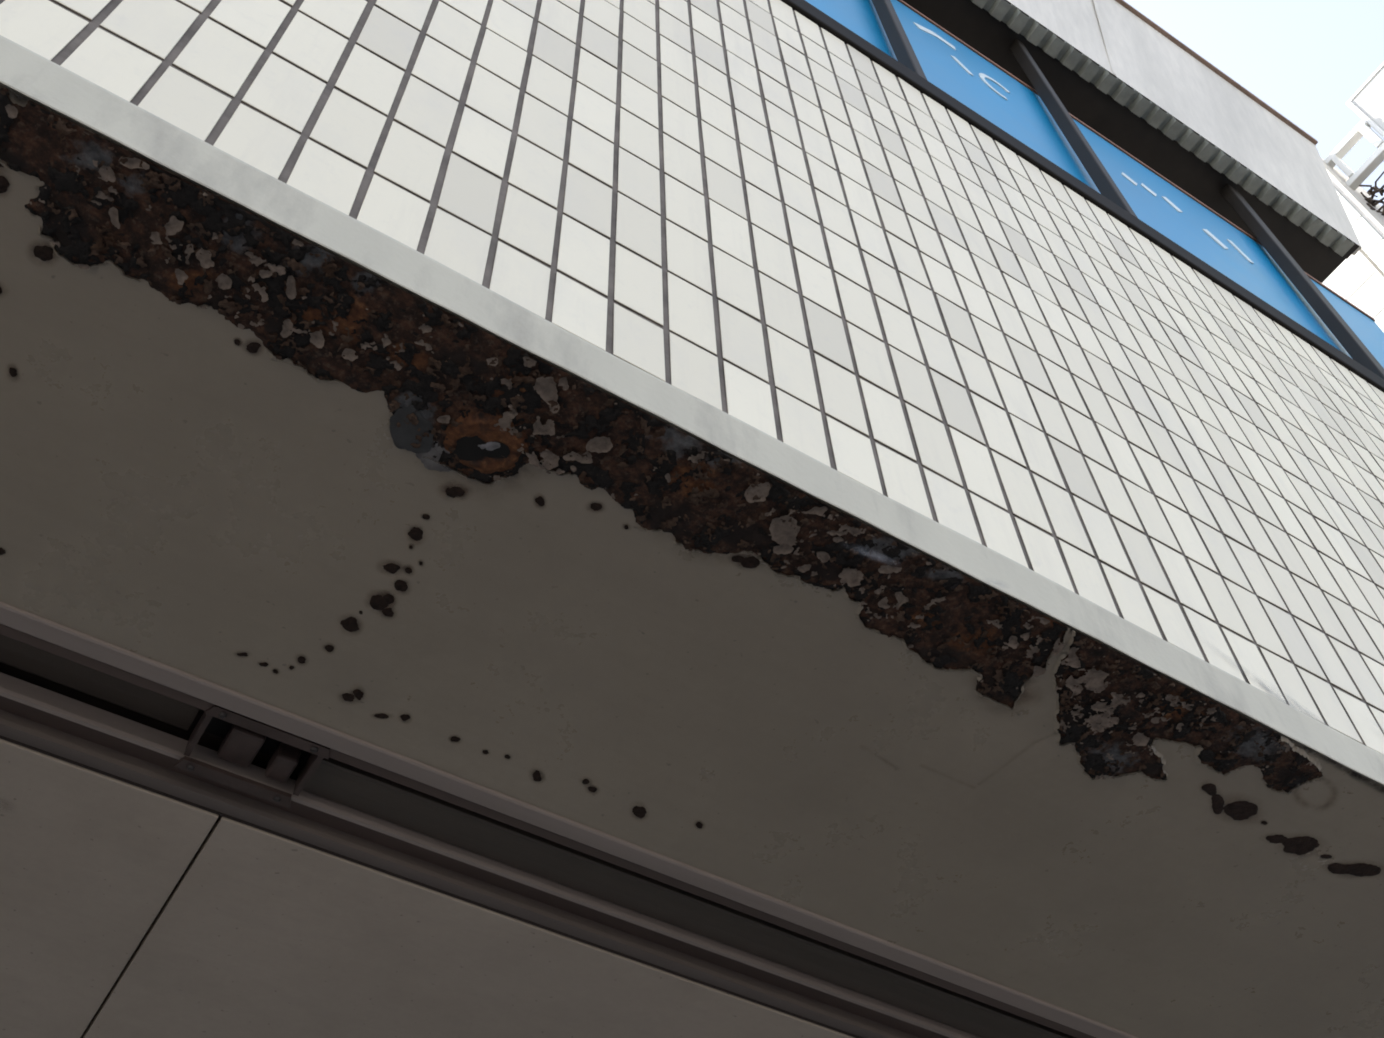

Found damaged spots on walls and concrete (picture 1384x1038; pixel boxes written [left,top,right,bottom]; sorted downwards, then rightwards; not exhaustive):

corrosion [0,88,1323,794]
corrosion [632,806,647,818]